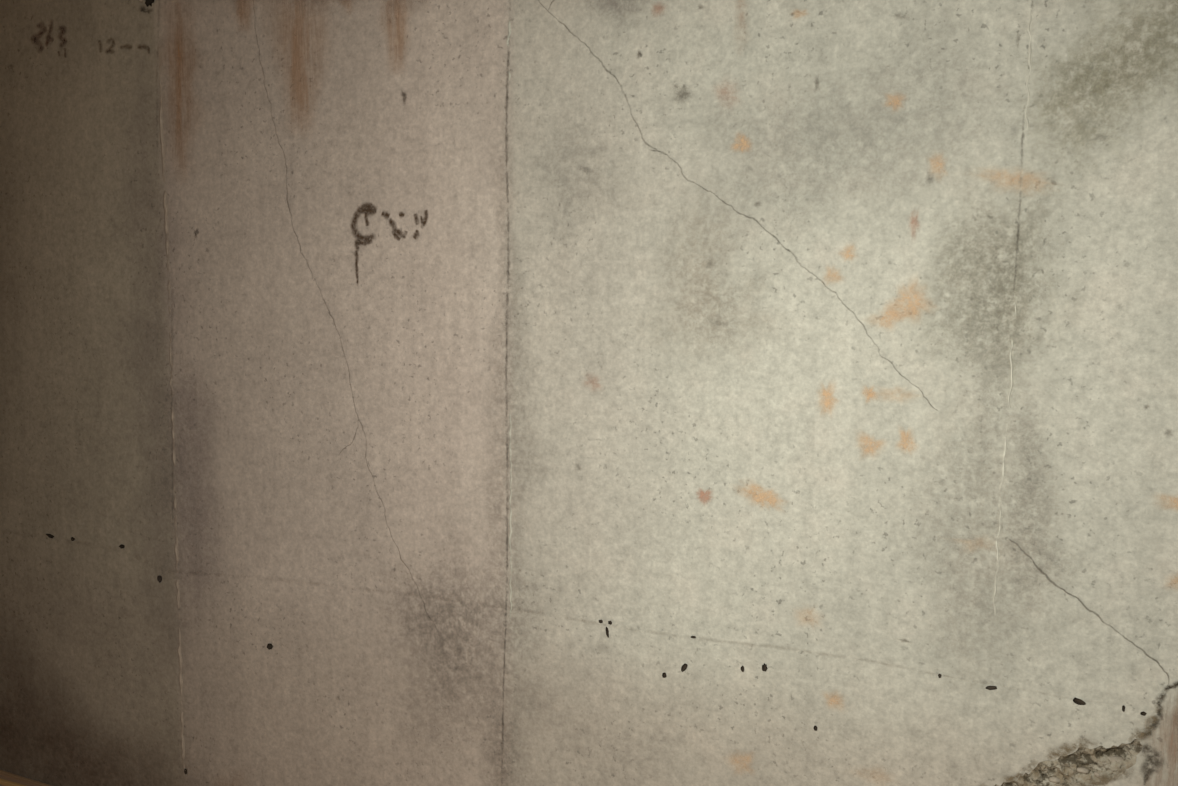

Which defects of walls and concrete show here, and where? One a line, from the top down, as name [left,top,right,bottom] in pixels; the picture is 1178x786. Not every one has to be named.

spalling [995,682,1178,786]